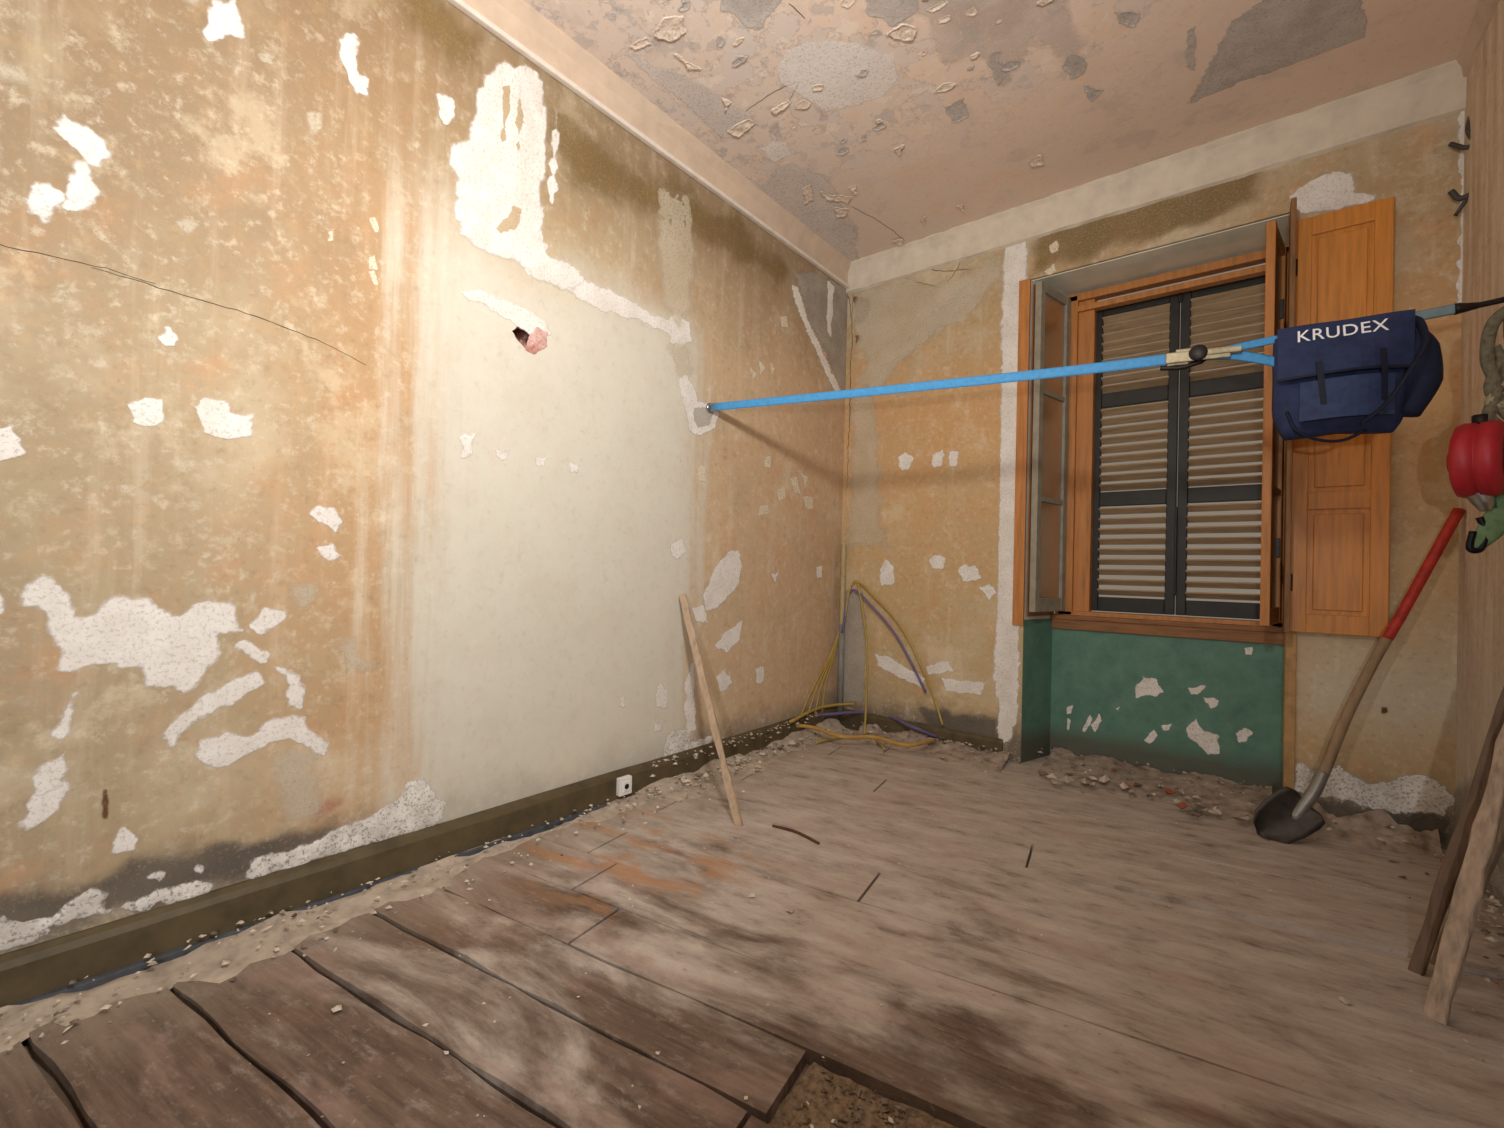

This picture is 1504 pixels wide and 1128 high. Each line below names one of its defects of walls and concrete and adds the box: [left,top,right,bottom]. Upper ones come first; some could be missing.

peeling [1185,0,1367,103]
peeling [62,160,100,211]
peeling [437,62,584,290]
crack [0,244,364,364]
peeling [1067,705,1119,732]
peeling [1135,677,1163,698]
peeling [1144,720,1253,755]
peeling [1188,685,1219,708]
leakage [0,865,213,950]